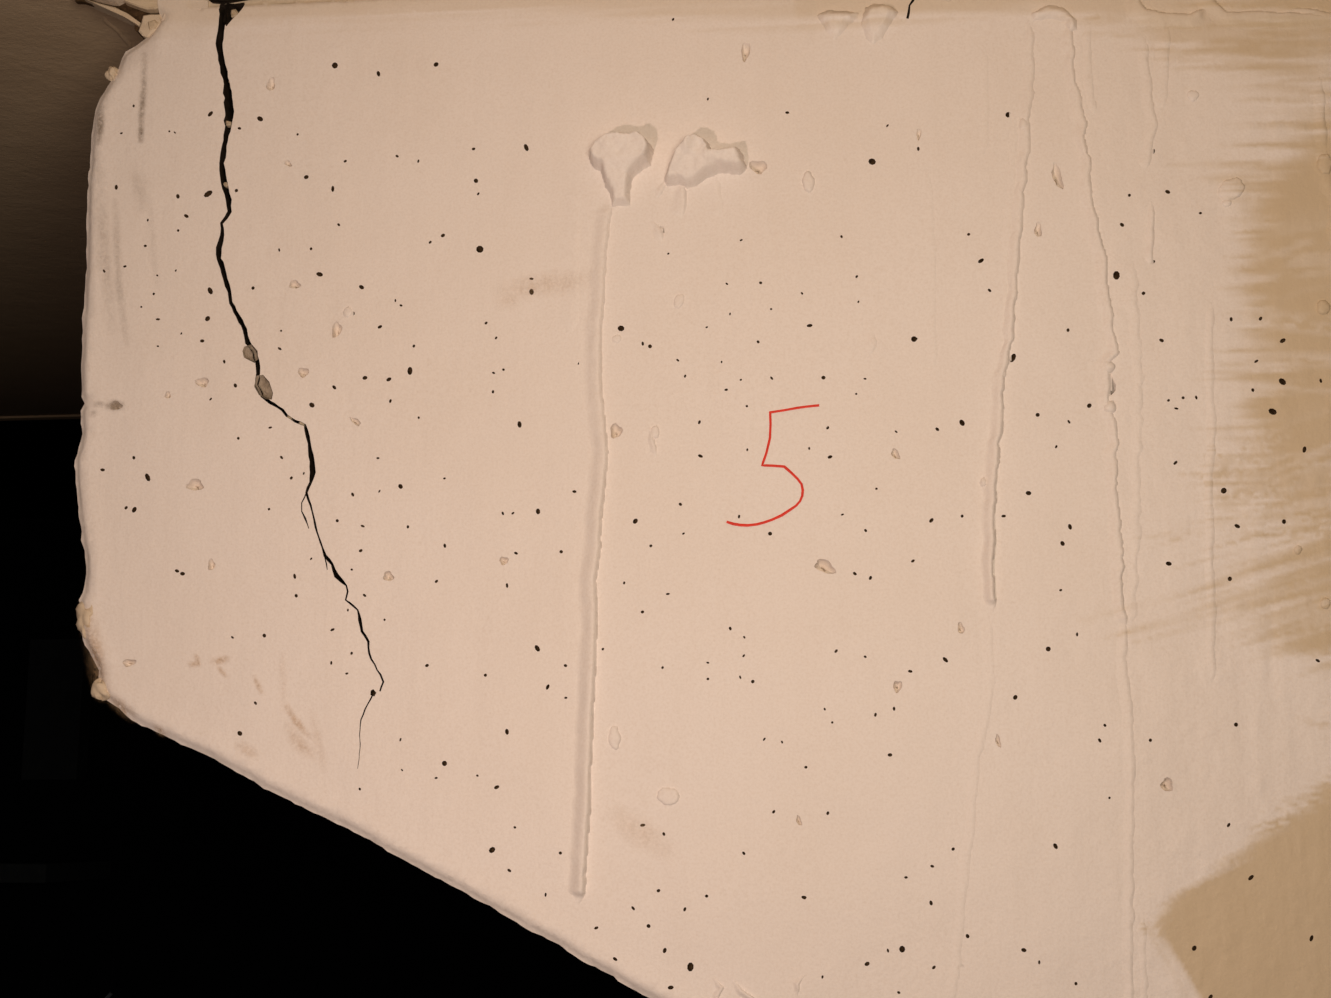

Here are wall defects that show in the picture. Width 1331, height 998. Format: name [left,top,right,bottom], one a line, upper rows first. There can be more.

crack [209,0,384,765]